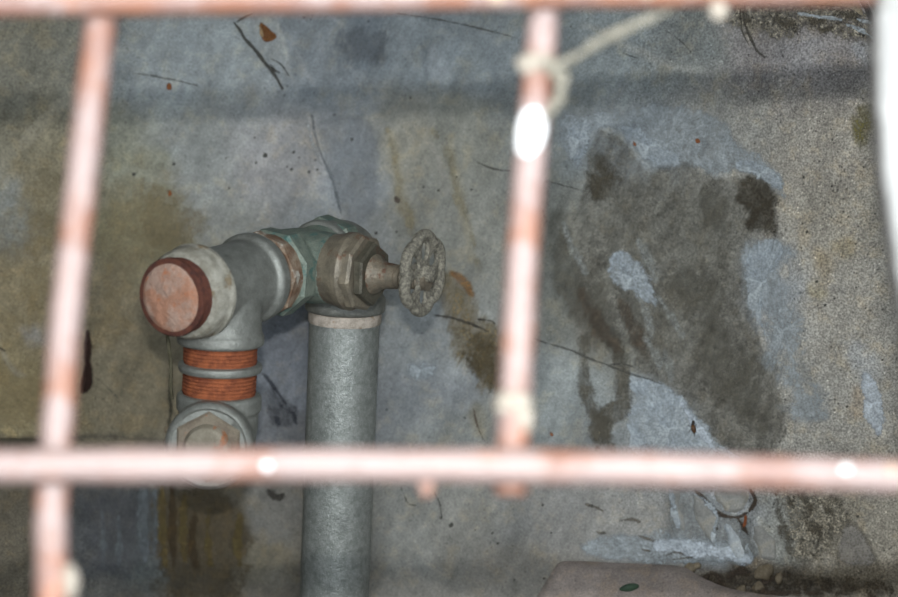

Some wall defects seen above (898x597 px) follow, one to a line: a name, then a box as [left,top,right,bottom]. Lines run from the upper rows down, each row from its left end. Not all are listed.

crack [233,14,289,90]
rust [259,23,277,42]
damp [552,104,827,454]
crack [535,339,660,384]